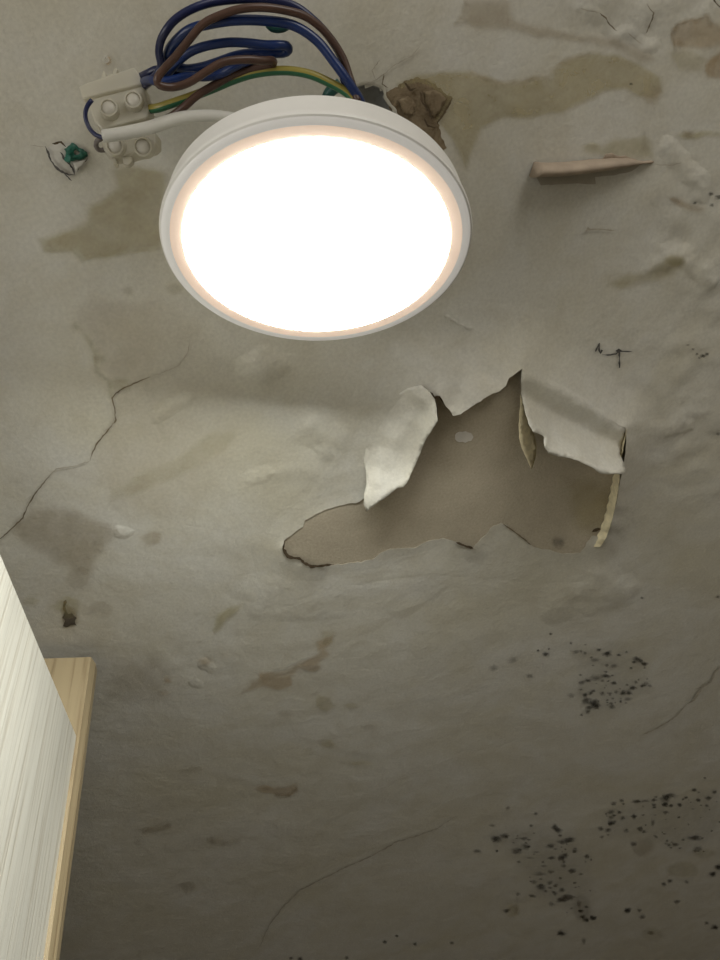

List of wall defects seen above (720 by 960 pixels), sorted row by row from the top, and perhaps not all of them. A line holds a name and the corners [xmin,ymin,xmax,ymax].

spalling [386,77,453,150]
peeling [529,153,654,185]
crack [0,343,190,539]
peeling [250,301,692,594]
damp [580,649,645,709]